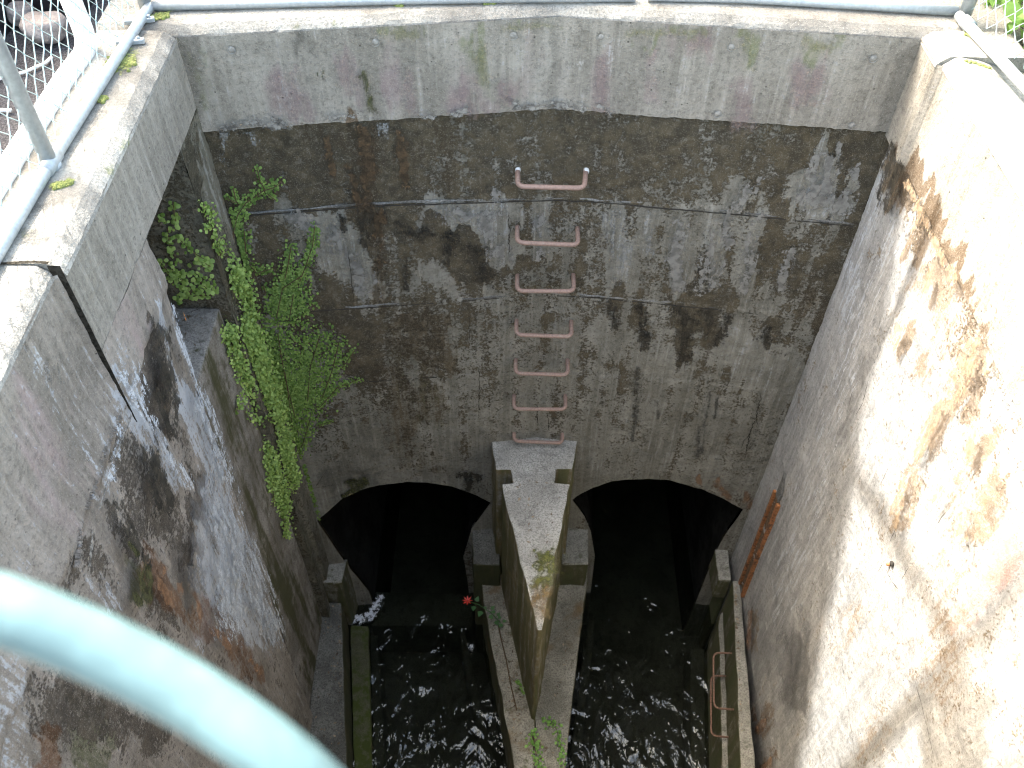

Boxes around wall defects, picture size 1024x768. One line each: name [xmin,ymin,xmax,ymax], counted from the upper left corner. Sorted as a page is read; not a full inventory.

leakage [876,139,903,215]
leakage [339,209,498,289]
crack [0,260,137,422]
leakage [635,304,651,352]
leakage [668,303,733,365]
leakage [756,324,772,350]
leakage [107,421,124,482]
leakage [113,305,285,650]